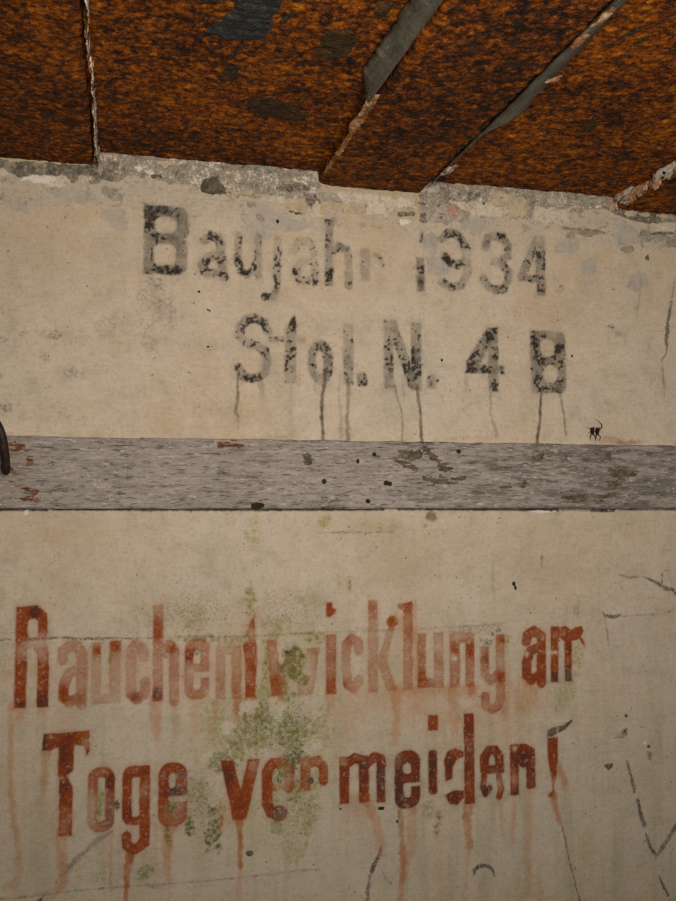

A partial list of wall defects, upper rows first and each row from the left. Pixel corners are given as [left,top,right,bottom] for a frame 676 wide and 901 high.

spalling [0,0,676,276]